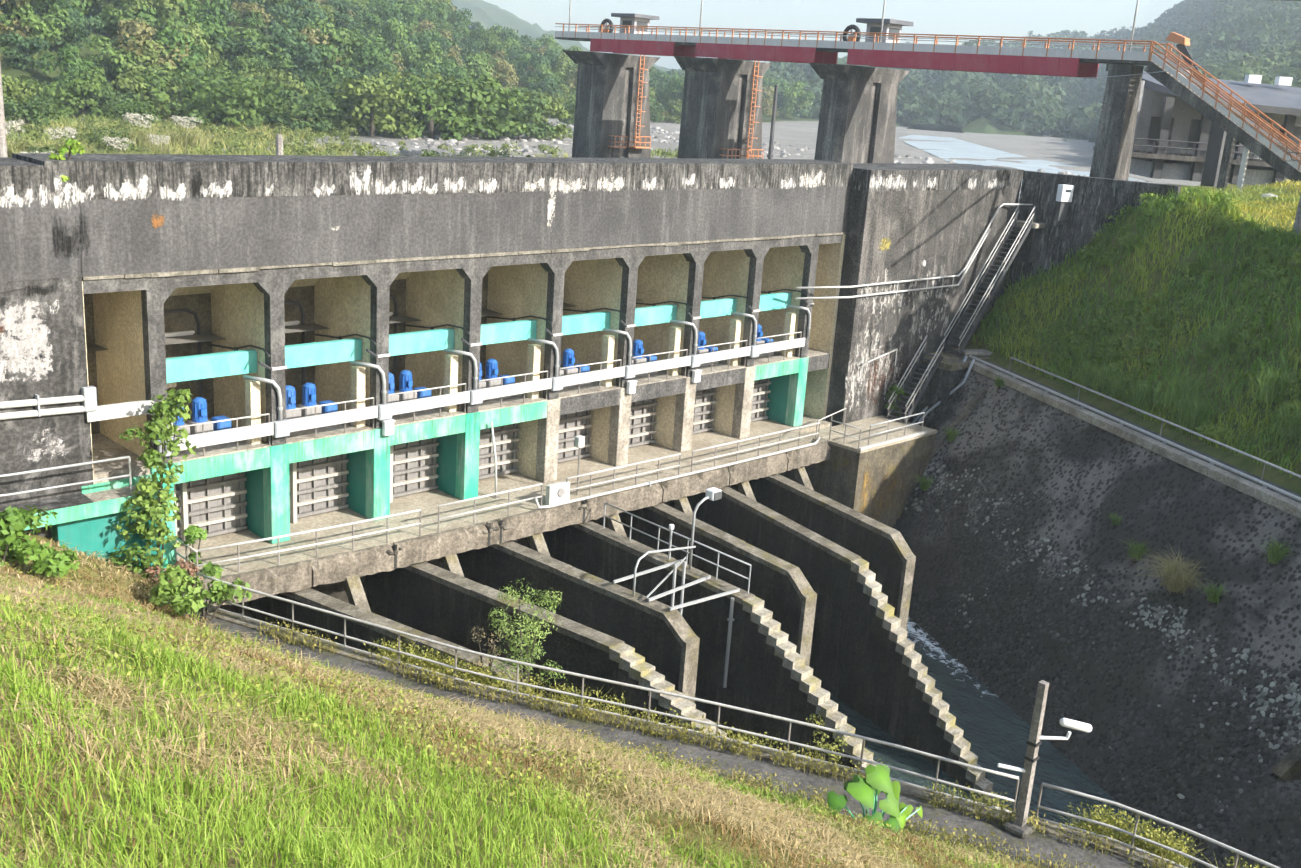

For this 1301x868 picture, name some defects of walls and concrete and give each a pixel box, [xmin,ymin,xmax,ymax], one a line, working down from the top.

water stain [191,172,203,196]
water stain [547,174,556,227]
water stain [52,218,89,258]
spalling [0,299,59,382]